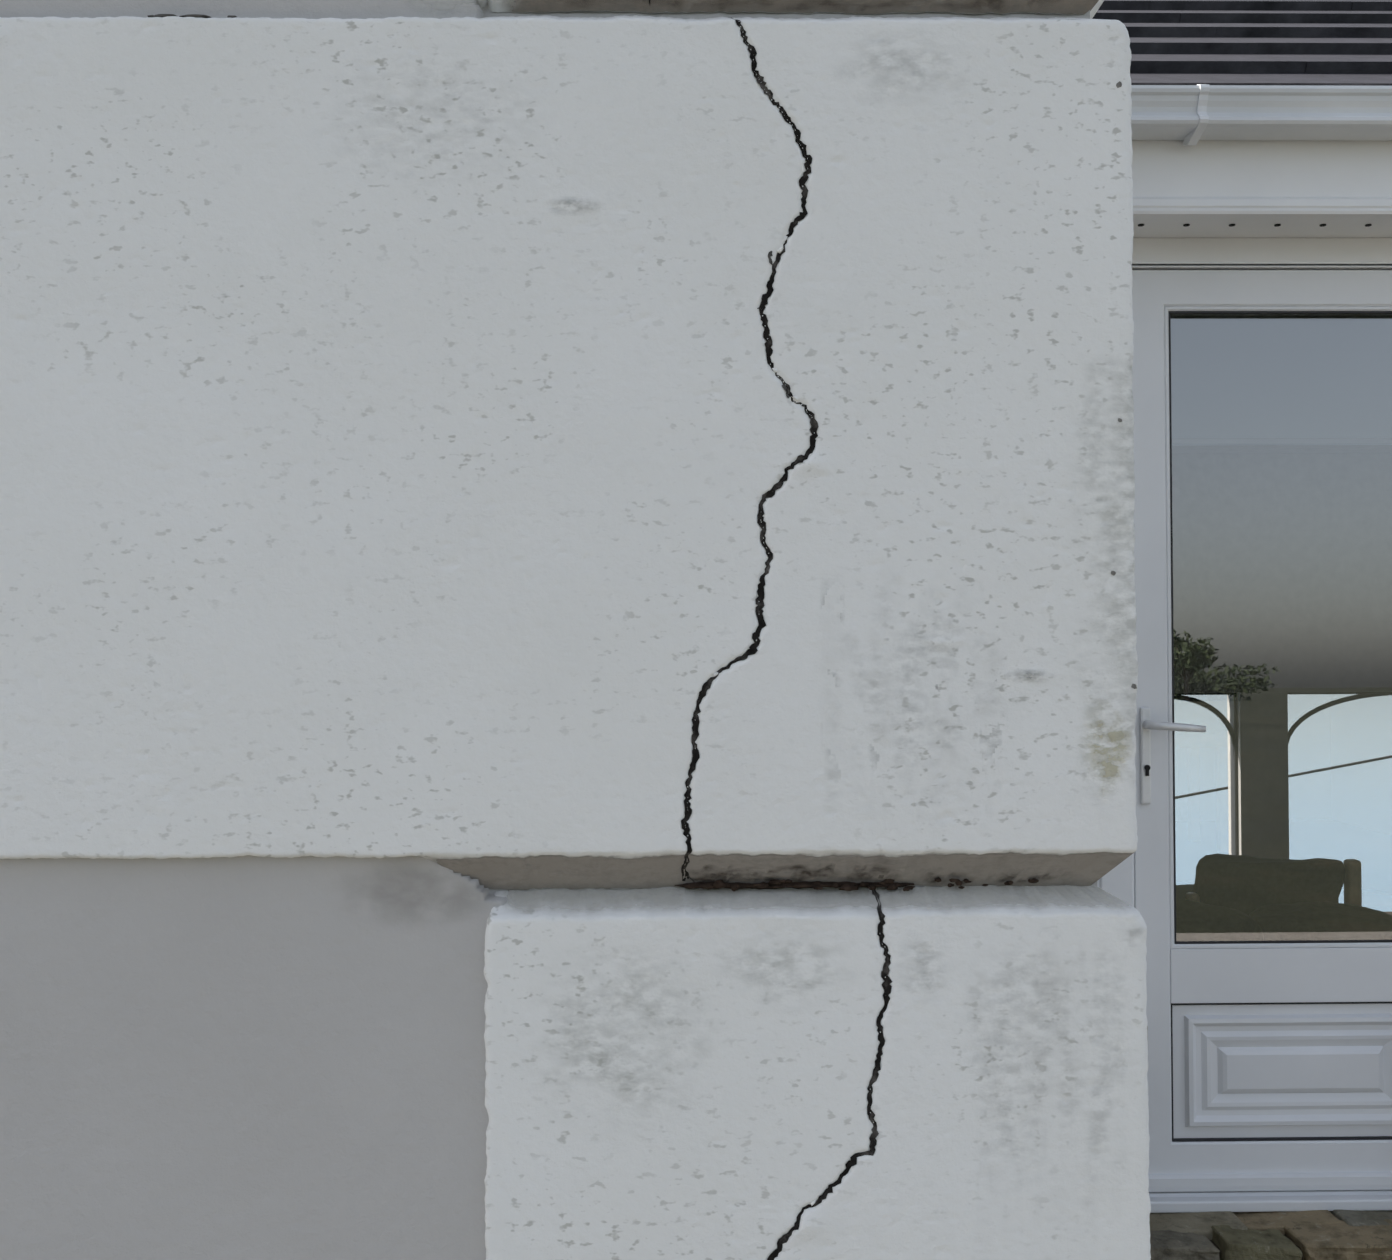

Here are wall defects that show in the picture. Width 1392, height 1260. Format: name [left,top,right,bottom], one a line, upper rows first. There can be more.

crack [681,18,818,882]
crack [767,890,892,1260]